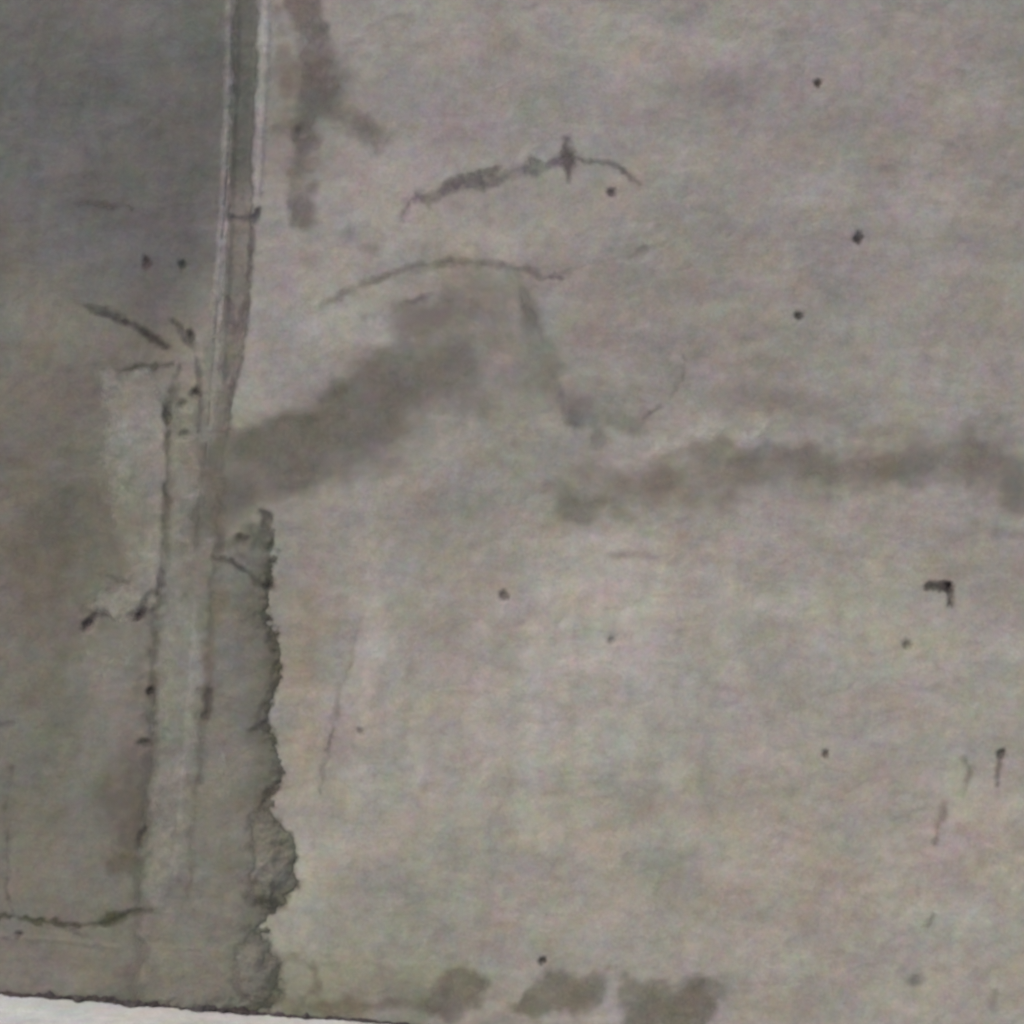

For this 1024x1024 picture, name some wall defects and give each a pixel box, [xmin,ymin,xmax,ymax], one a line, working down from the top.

water stain [283,0,340,226]
crack [407,137,630,206]
water stain [198,347,476,525]
water stain [702,436,1024,492]
water stain [423,969,489,1021]
water stain [518,971,604,1013]
water stain [625,980,715,1024]